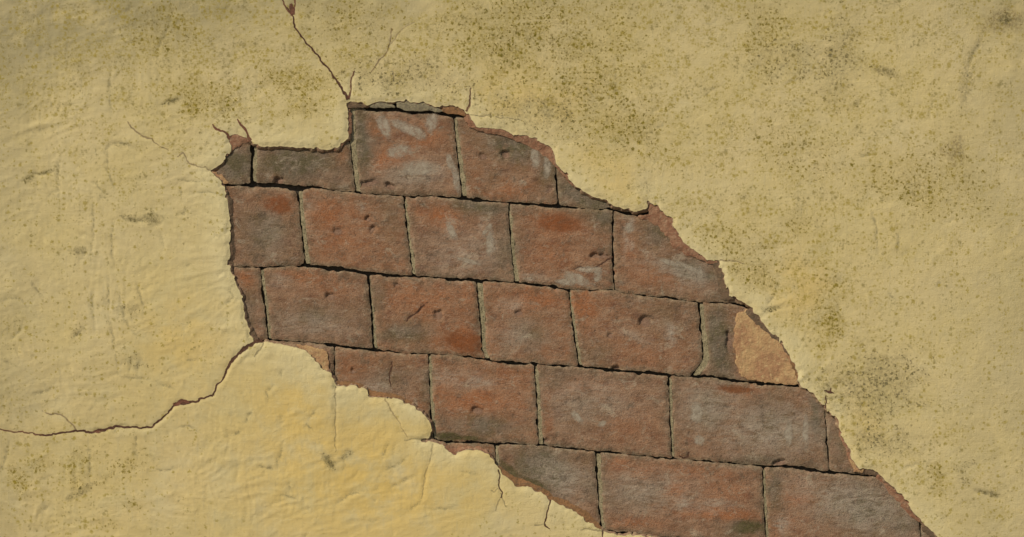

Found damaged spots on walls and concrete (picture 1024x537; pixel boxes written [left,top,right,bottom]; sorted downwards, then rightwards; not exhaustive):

crack [282,0,355,100]
spalling [212,100,936,537]
crack [0,339,263,436]